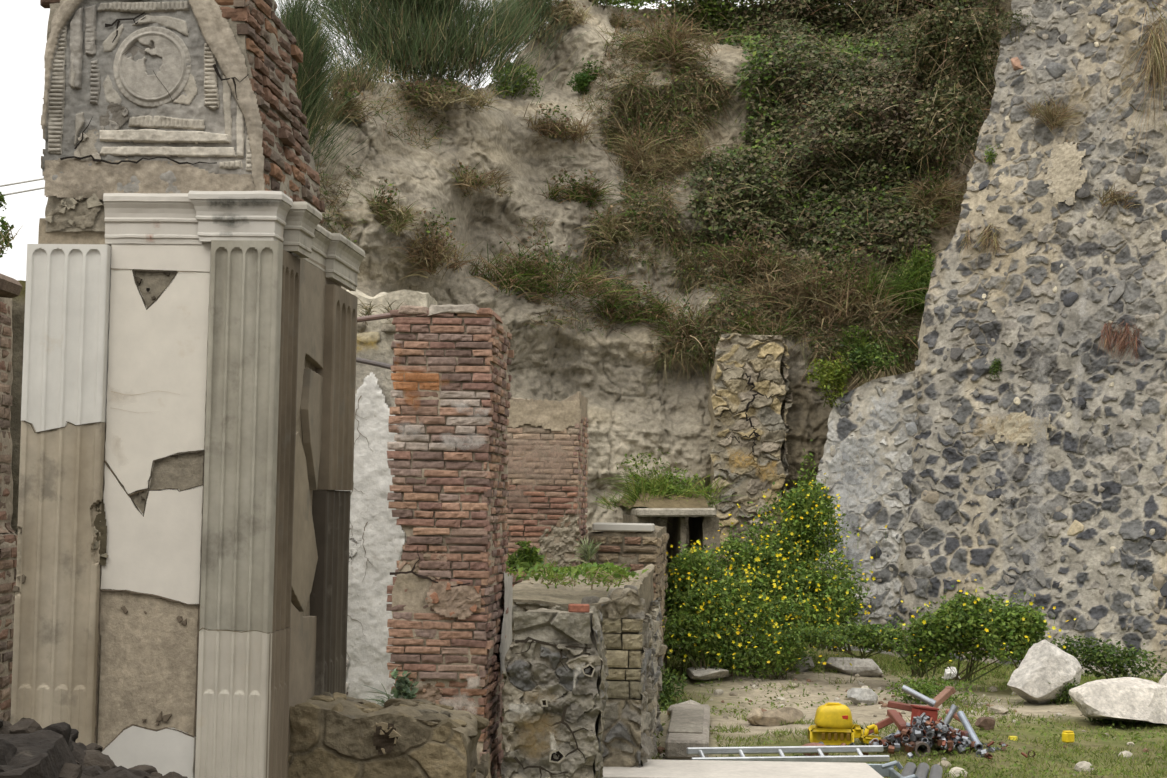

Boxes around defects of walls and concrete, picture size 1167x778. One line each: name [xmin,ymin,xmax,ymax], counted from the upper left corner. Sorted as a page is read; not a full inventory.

peeling [132,269,178,310]
peeling [128,450,205,517]
spalling [12,529,26,593]
spalling [93,499,108,566]
crack [347,522,471,660]
peeling [94,589,200,751]